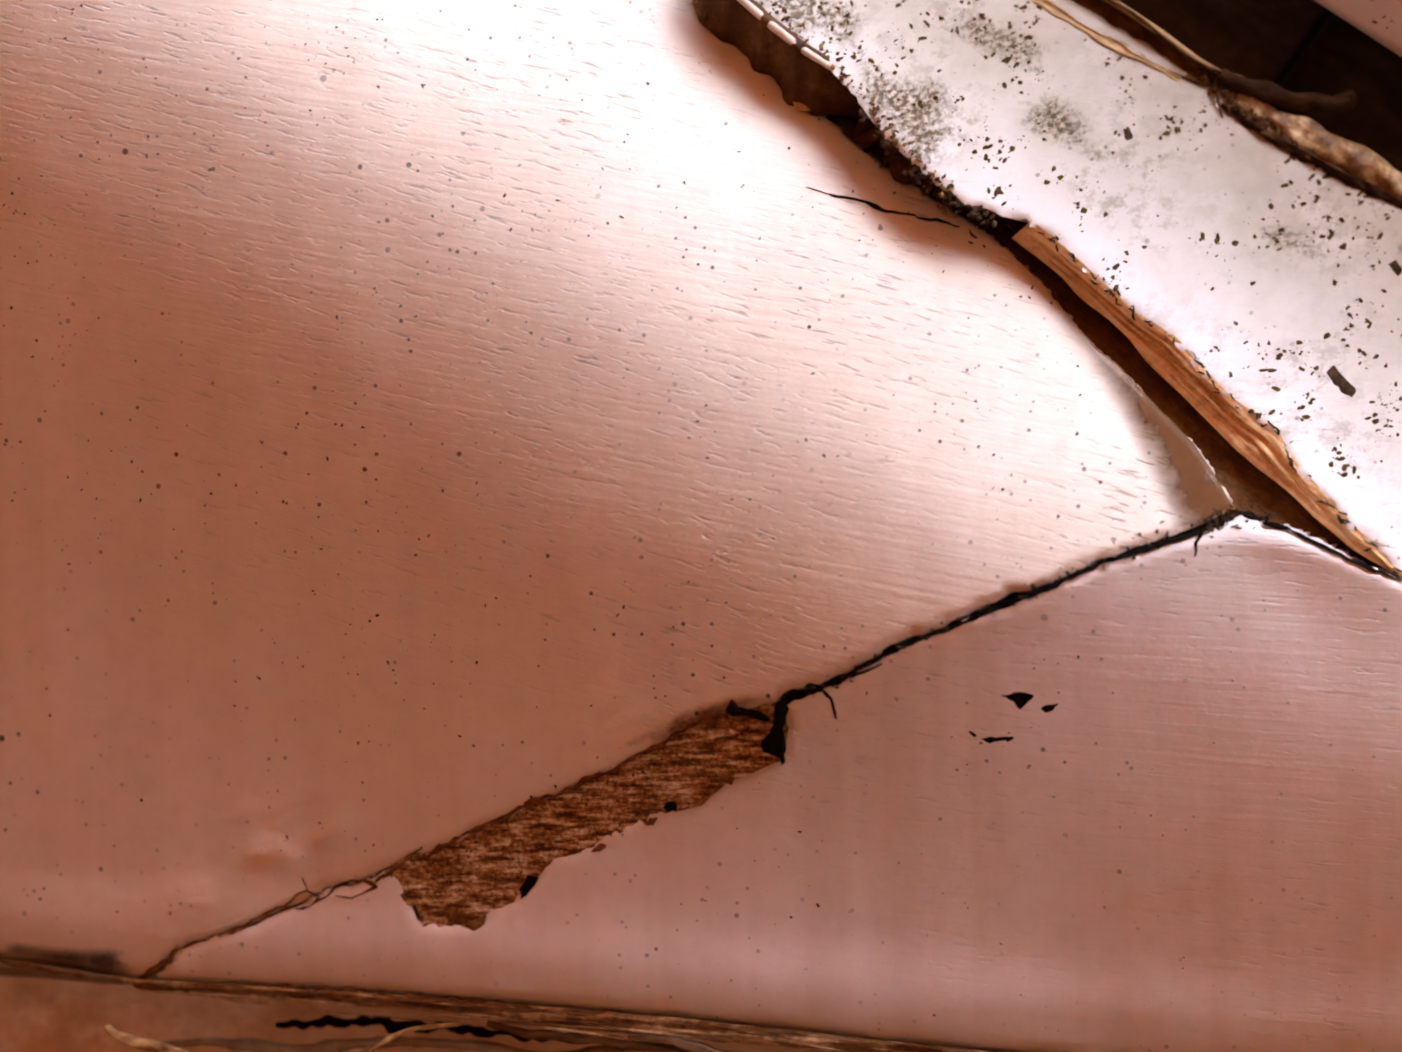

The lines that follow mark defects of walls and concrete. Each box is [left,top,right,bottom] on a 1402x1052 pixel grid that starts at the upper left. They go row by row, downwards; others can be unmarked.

peeling [1031,0,1402,209]
crack [756,0,1402,719]
peeling [1388,260,1402,276]
crack [135,847,423,979]
peeling [384,697,789,931]